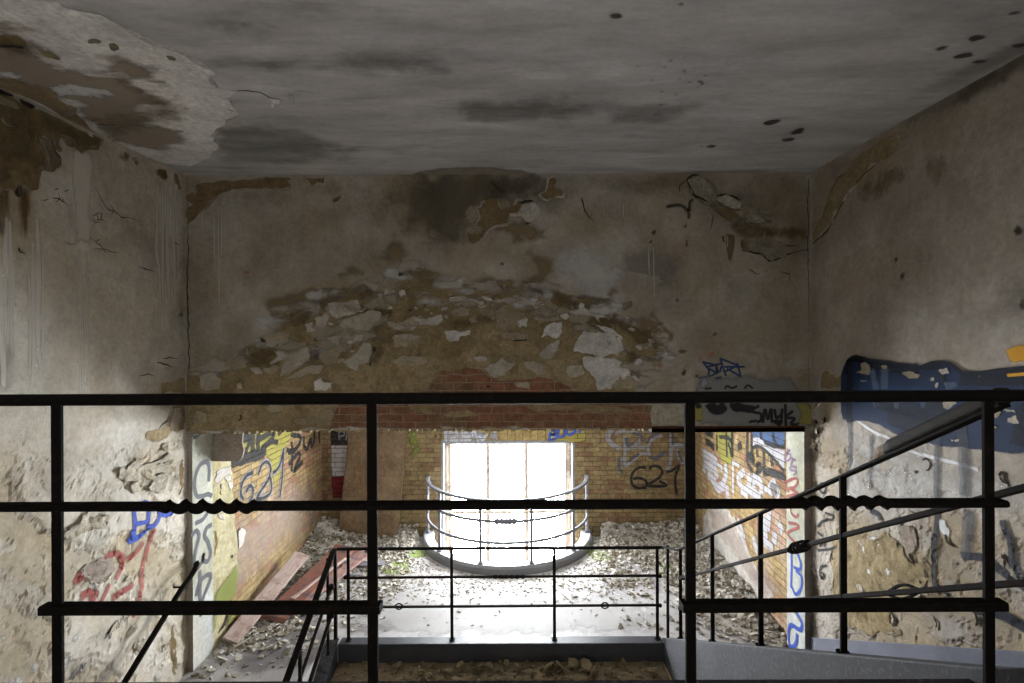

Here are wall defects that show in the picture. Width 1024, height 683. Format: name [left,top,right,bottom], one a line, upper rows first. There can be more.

peeling [0,0,326,223]
water stain [408,167,534,239]
peeling [452,176,565,245]
water stain [0,217,14,387]
water stain [73,150,93,394]
crack [174,178,190,372]
peeling [117,260,677,494]
peeling [64,512,111,541]
peeling [79,557,115,585]
peeling [829,510,932,598]
peeling [109,621,147,652]
peeling [847,612,903,637]